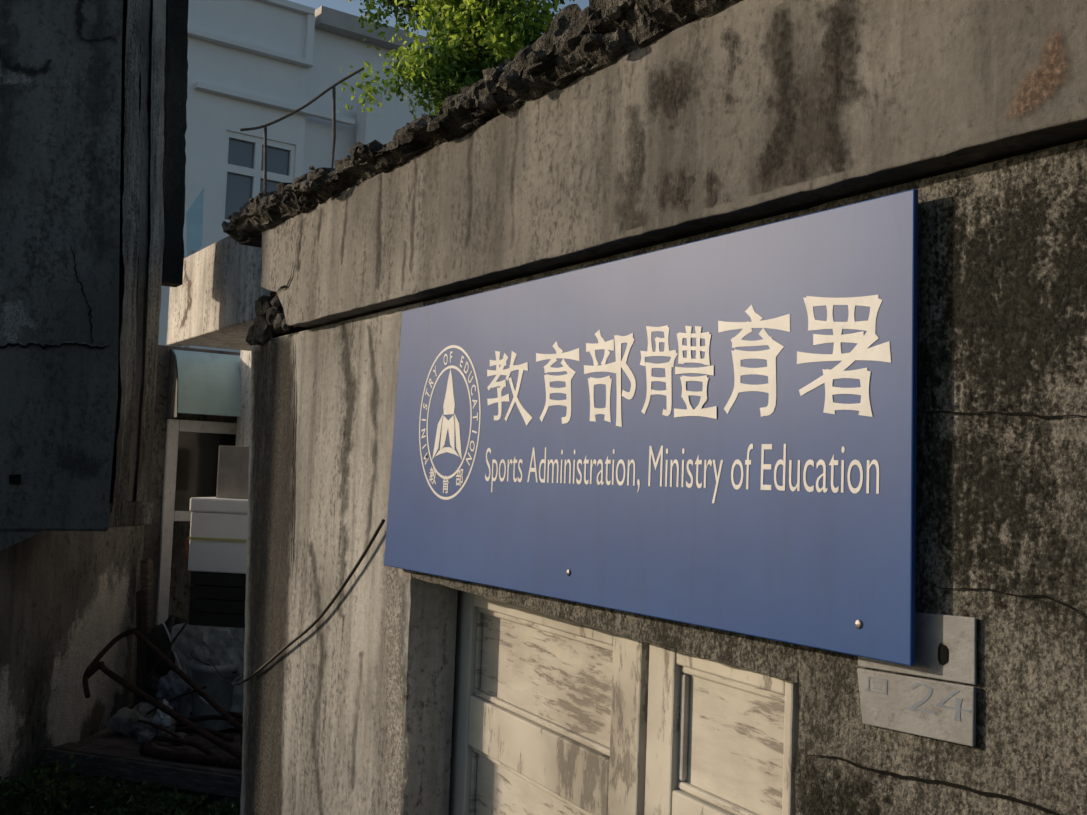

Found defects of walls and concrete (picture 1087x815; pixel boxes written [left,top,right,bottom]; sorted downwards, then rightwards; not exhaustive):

spalling [221,0,741,248]
leakage [616,61,696,230]
leakage [753,0,866,192]
crack [0,246,110,349]
spalling [245,291,312,346]
leakage [916,149,1087,634]
crack [917,410,1087,419]
crack [930,586,1087,619]
leakage [793,758,903,815]
crack [806,755,1062,815]